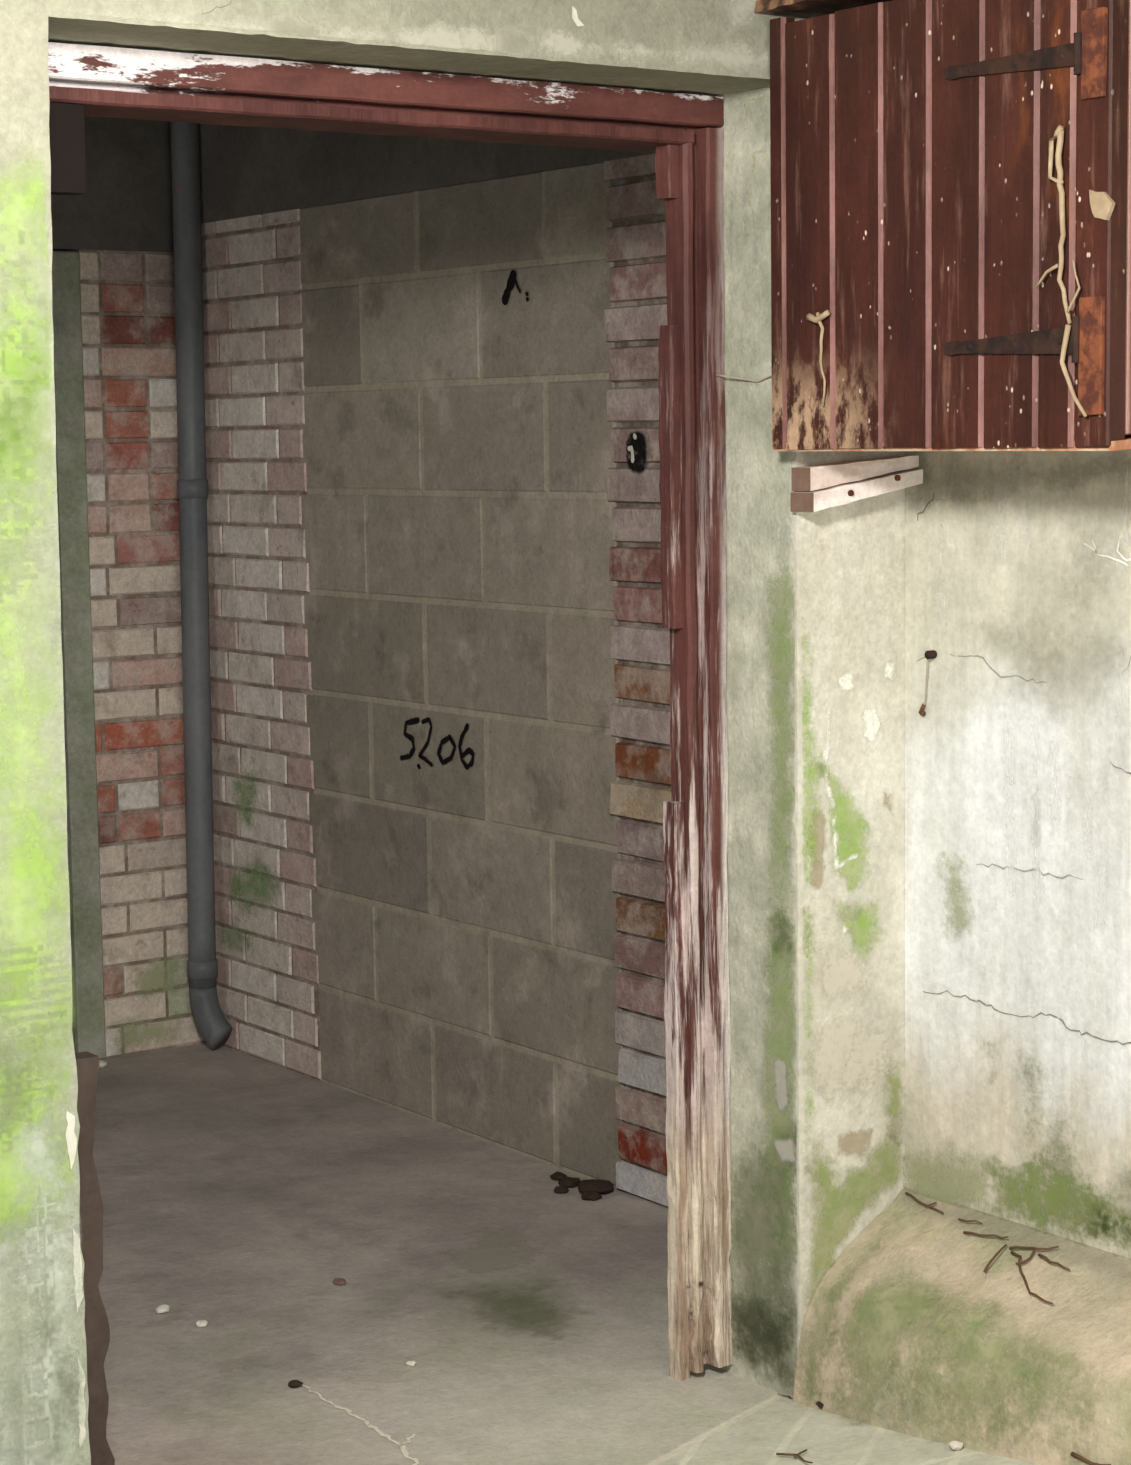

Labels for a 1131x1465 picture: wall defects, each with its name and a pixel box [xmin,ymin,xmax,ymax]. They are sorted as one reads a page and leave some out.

crack [923,990,1131,1045]